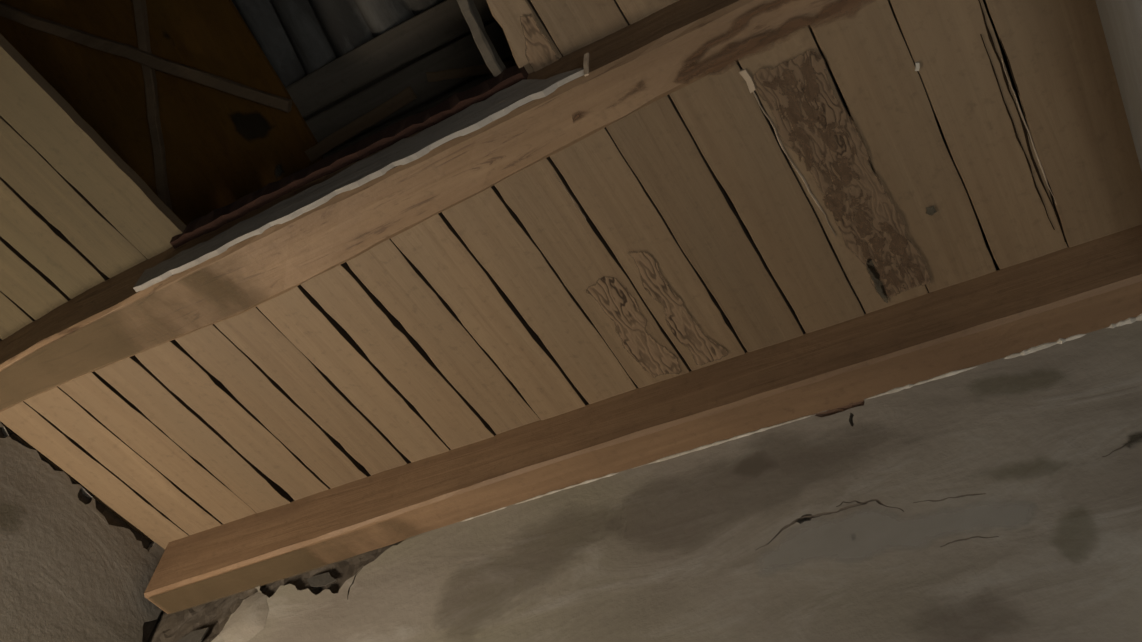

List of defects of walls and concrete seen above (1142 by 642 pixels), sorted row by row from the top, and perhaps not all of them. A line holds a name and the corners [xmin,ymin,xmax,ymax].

spalling [70,479,151,549]
crack [756,493,986,550]
spalling [142,540,404,642]